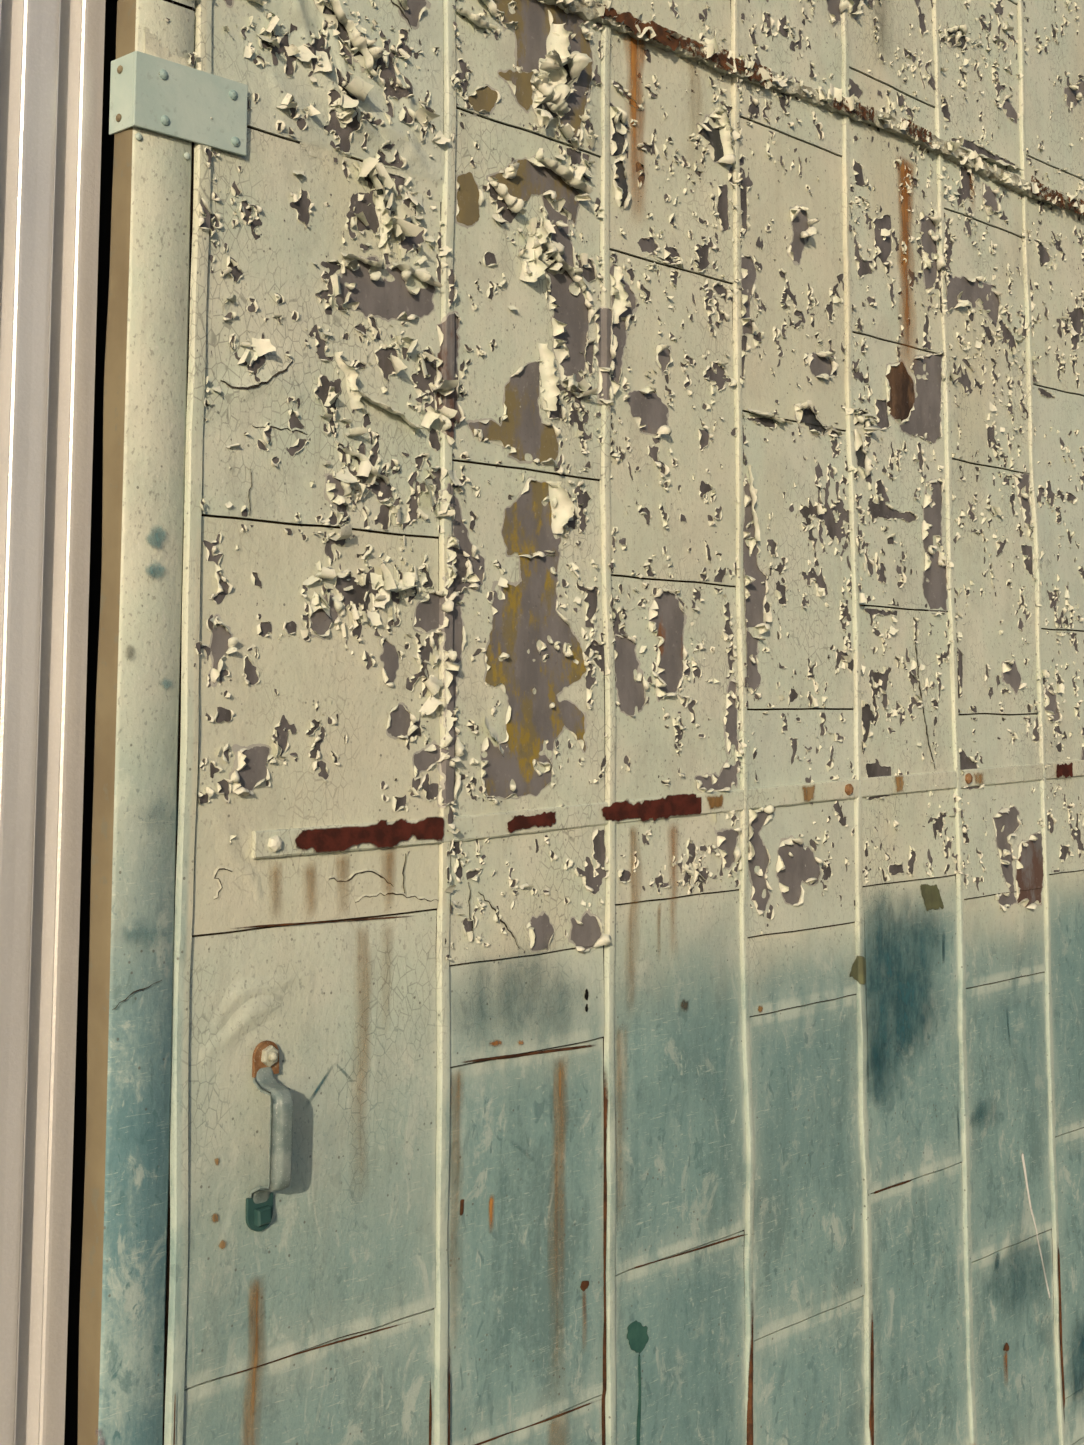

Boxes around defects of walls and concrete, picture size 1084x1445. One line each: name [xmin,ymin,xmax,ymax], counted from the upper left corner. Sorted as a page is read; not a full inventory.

corrosion [601,5,773,173]
corrosion [833,98,874,122]
corrosion [902,118,933,148]
corrosion [1031,176,1084,216]
corrosion [899,161,912,352]
peeling [193,0,1084,960]
corrosion [295,817,444,876]
corrosion [507,811,556,833]
corrosion [602,794,723,822]
corrosion [475,1073,608,1445]
corrosion [429,1357,450,1445]